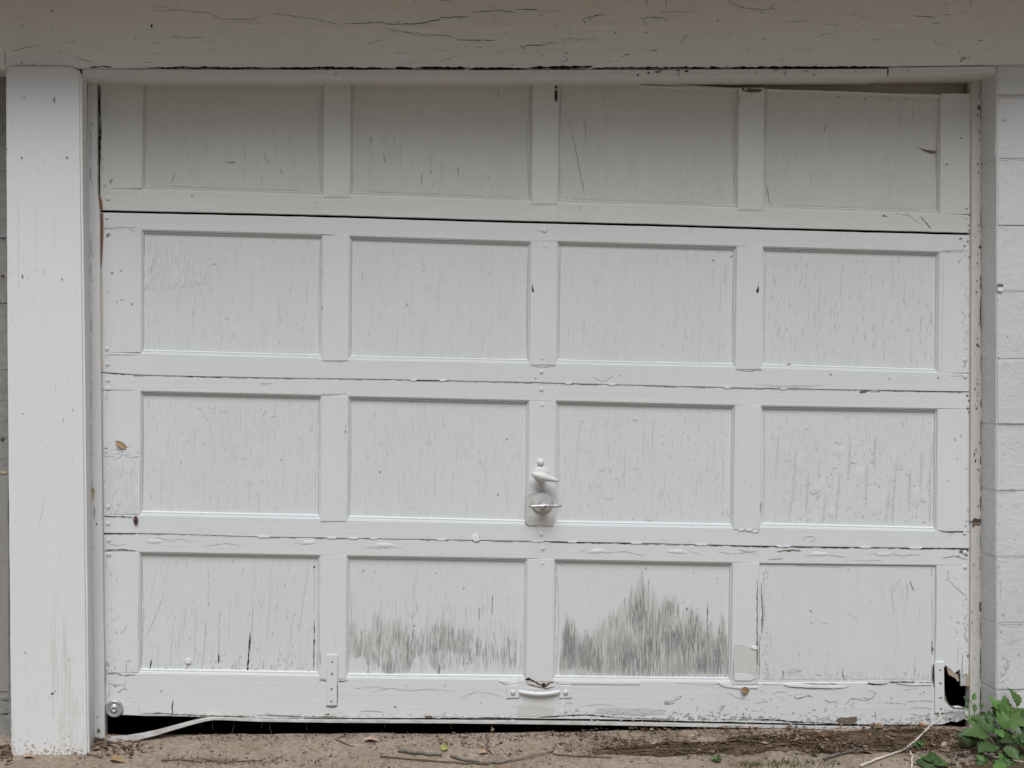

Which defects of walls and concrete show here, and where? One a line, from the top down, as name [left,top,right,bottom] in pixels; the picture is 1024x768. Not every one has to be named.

crack [135,0,971,76]